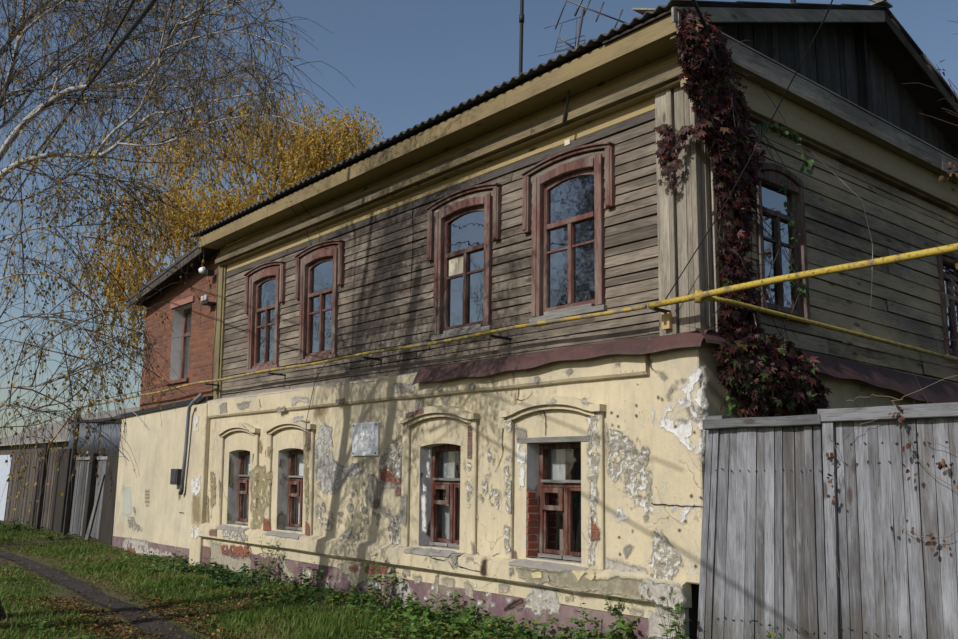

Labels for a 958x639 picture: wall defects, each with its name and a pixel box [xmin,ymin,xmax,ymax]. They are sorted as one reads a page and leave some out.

peeling [190,441,330,592]
peeling [277,397,407,546]
peeling [337,397,699,639]
peeling [652,368,706,461]